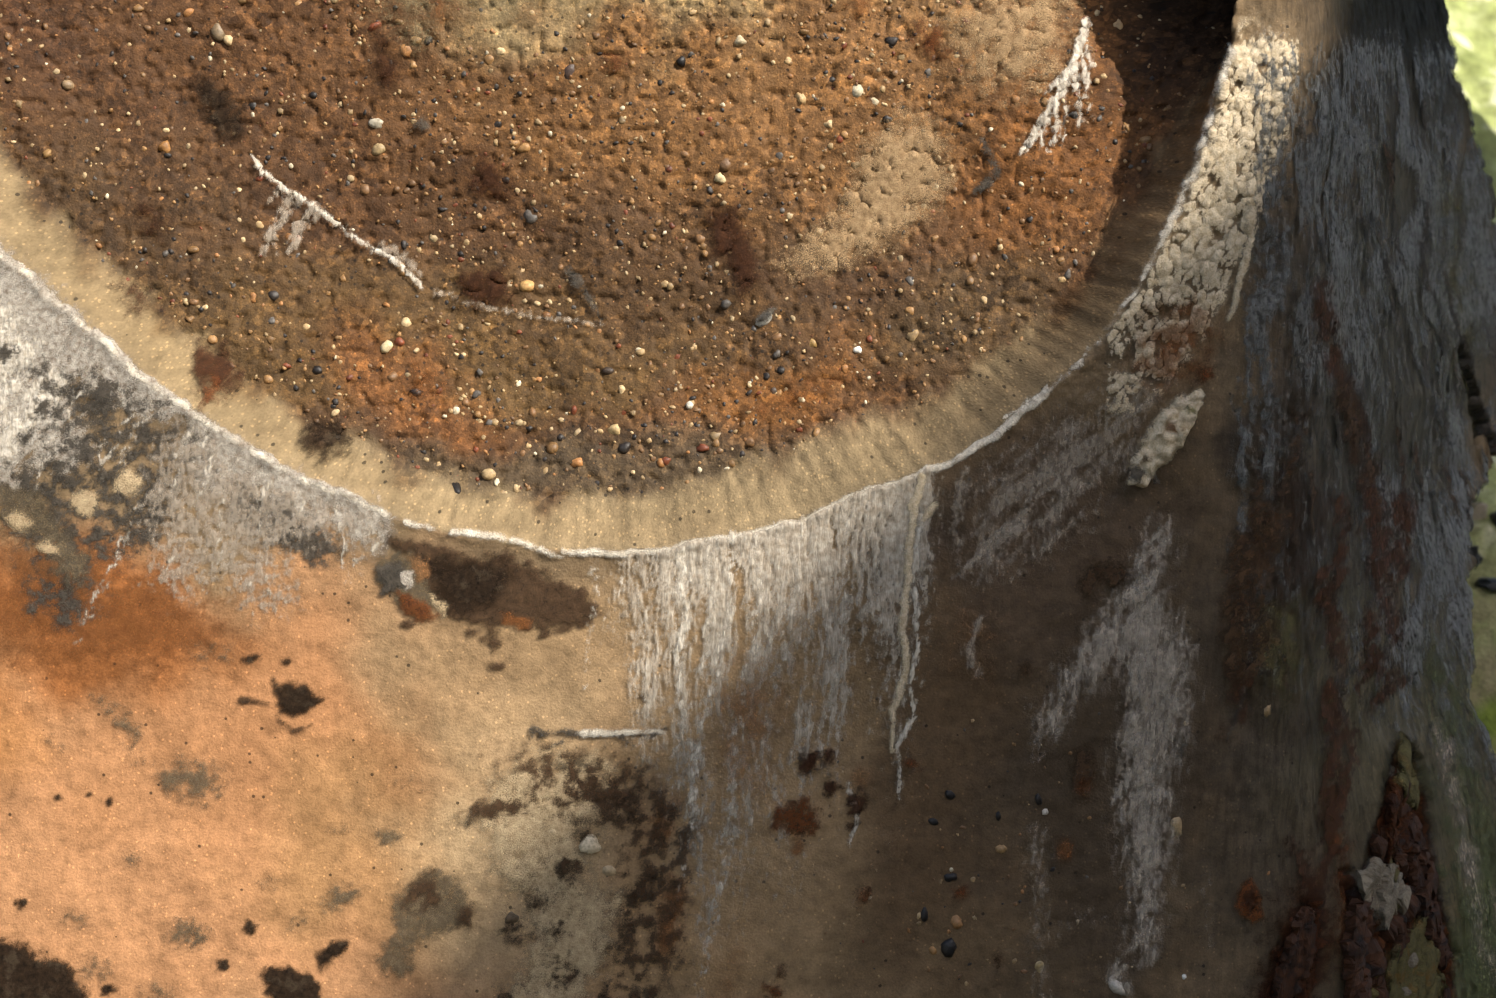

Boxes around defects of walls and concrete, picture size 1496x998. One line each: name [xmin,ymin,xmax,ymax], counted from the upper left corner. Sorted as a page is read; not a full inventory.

rust [0,525,216,679]
crack [250,154,604,325]
leakage [0,237,1053,959]
crack [972,137,1001,194]
leakage [1042,526,1193,992]
leakage [960,17,1496,909]
spalling [1235,731,1455,998]
crack [1288,142,1496,561]